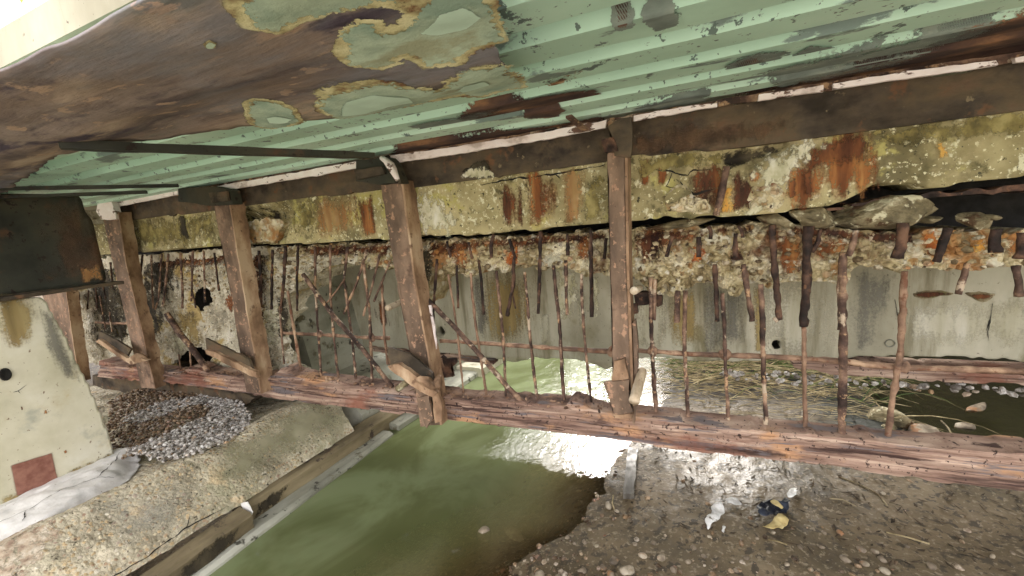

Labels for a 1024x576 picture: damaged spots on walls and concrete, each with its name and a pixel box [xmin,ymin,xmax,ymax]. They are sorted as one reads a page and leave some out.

peeling [611,0,679,31]
peeling [725,11,1000,88]
corrosion [0,0,604,193]
peeling [635,87,711,109]
crack [640,169,713,203]
corrosion [689,164,760,212]
corrosion [786,133,879,210]
leakage [247,205,286,222]
corrosion [429,171,606,266]
spalling [248,217,393,292]
corrosion [635,225,752,266]
spalling [913,290,995,302]